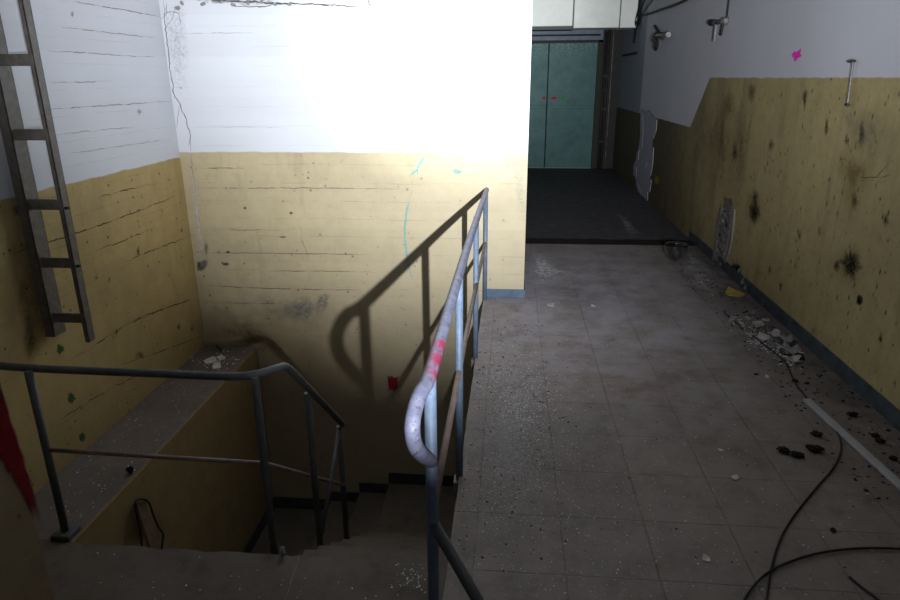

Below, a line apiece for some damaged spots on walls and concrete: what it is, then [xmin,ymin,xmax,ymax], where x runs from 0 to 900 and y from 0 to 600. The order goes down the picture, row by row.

crack [49,0,370,262]
peeling [633,110,657,201]
spalling [712,198,747,290]
leakage [835,252,857,276]